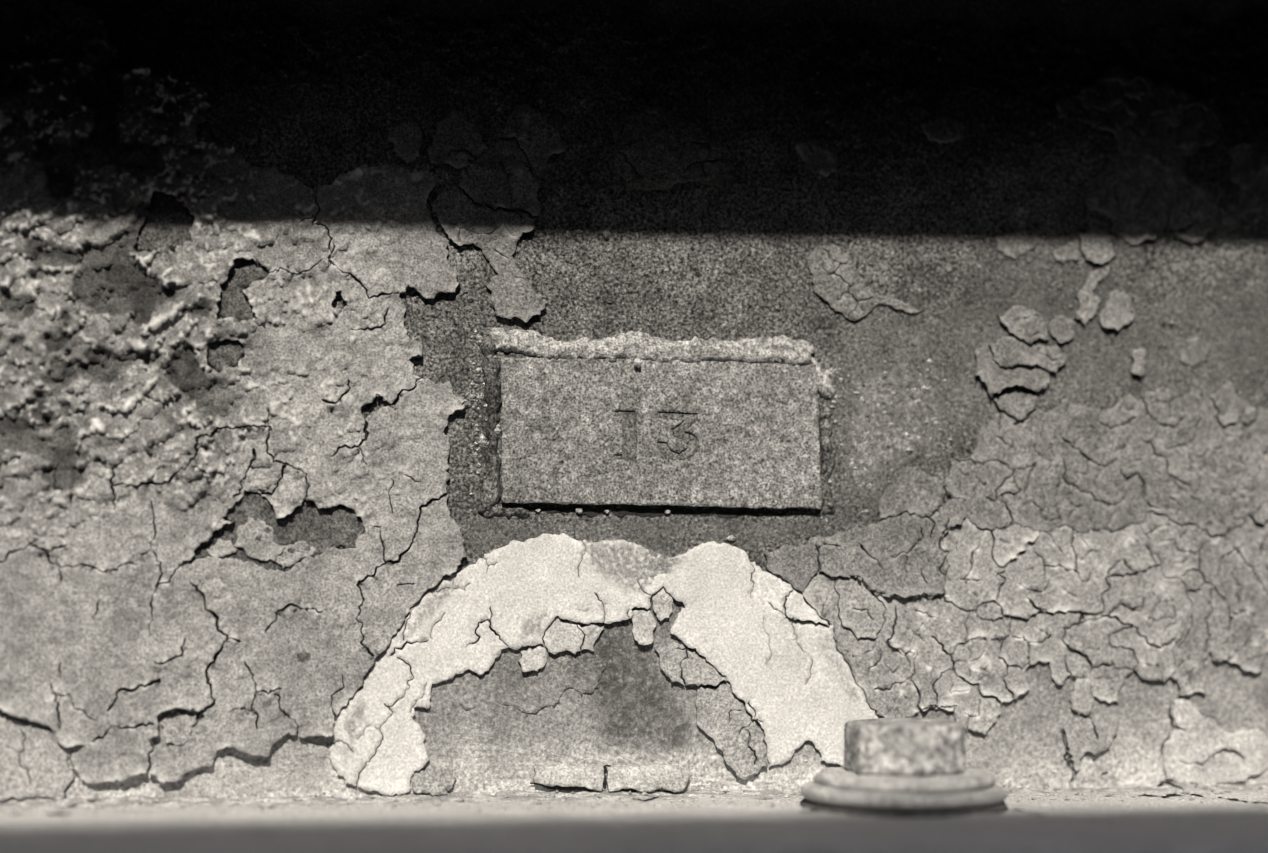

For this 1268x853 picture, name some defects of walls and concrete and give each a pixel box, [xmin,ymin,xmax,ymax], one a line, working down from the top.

crack [262,200,404,331]
peeling [427,104,568,323]
peeling [806,243,922,321]
peeling [0,0,468,785]
crack [0,375,423,815]
crack [330,474,464,788]
crack [471,607,509,649]
peeling [329,381,1268,796]
crack [524,396,1268,714]
peeling [0,716,74,801]
crack [530,764,682,801]
crack [1139,702,1268,803]